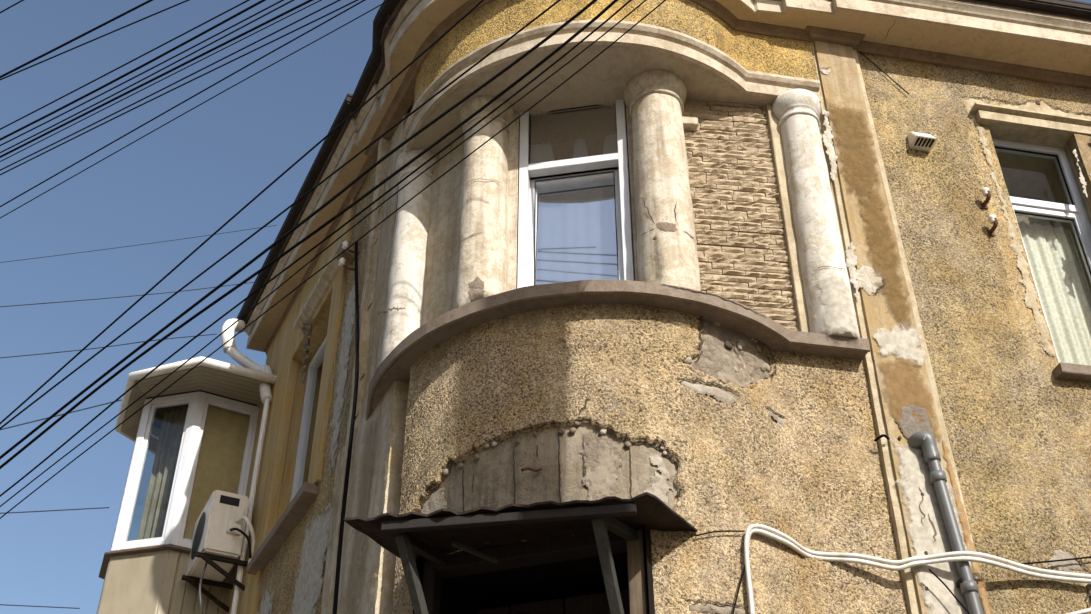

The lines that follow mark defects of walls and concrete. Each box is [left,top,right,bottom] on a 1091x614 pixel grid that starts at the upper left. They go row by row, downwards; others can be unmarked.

flaking render [822,110,838,181]
flaking render [961,96,1091,359]
flaking render [456,277,485,308]
flaking render [818,242,885,336]
flaking render [677,316,777,405]
flaking render [873,323,925,366]
flaking render [420,395,682,514]
flaking render [894,405,971,614]
flaking render [685,599,761,614]